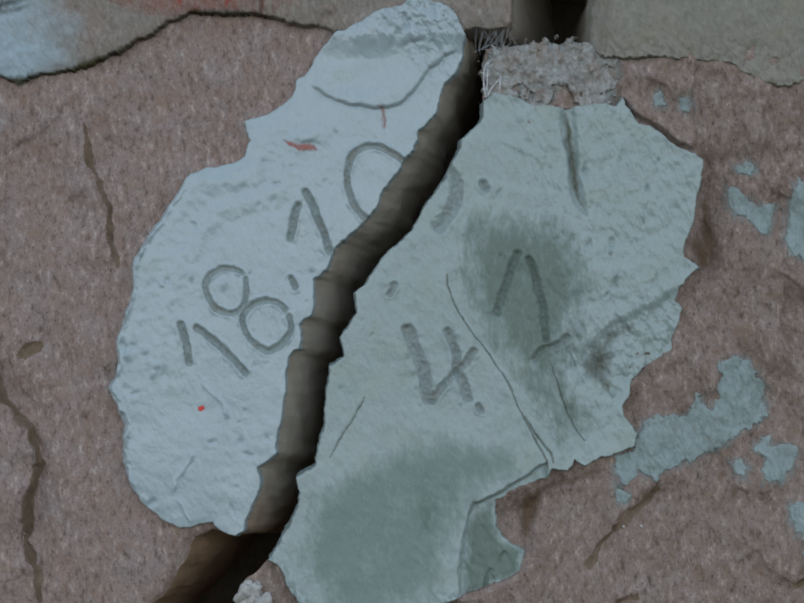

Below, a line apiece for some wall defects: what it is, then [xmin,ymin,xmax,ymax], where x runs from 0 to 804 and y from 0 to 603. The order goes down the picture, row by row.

crack [82,122,120,268]
crack [153,37,481,603]
crack [446,274,554,471]
spalling [683,171,731,281]
crack [0,372,46,603]
crack [792,579,804,589]